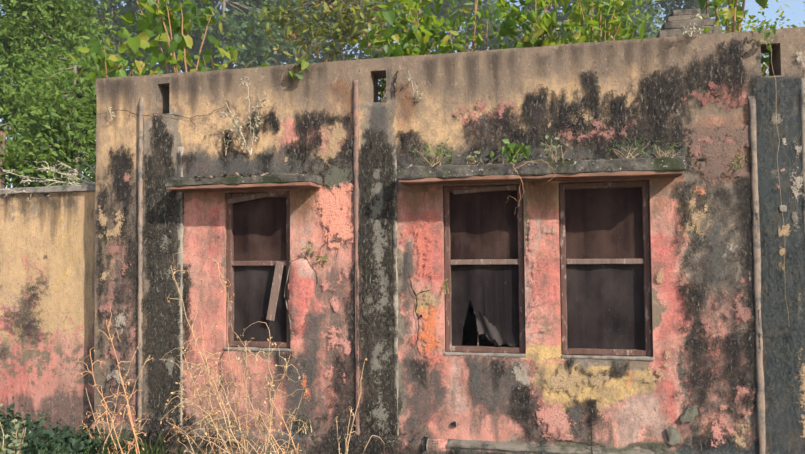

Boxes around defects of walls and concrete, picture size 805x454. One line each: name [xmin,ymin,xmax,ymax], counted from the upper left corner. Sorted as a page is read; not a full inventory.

crack [97,107,225,133]
water stain [246,103,281,145]
water stain [1,278,47,343]
water stain [95,110,357,454]
crack [406,253,432,356]
water stain [274,37,805,454]
peeling [511,358,609,445]